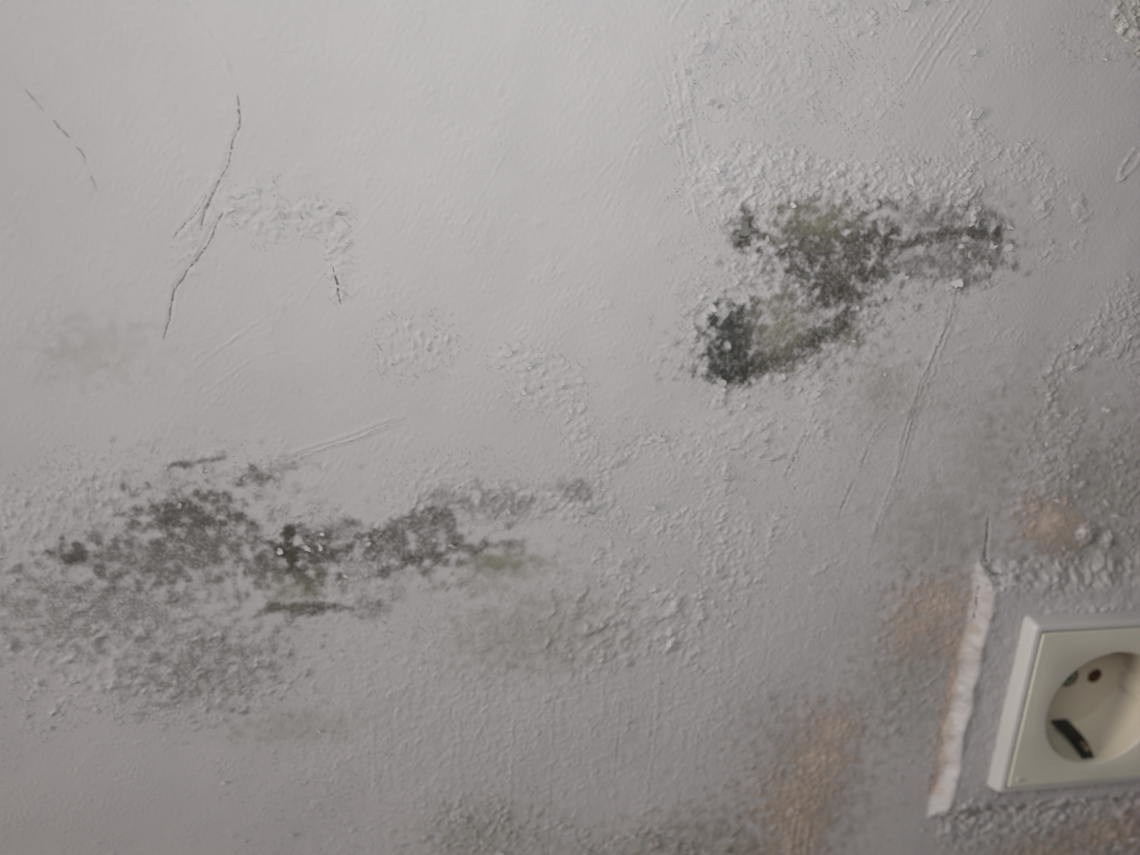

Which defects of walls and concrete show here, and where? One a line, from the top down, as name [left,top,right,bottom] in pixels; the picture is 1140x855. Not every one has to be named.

spalling [1112,0,1140,69]
crack [162,95,241,339]
peeling [166,168,357,309]
mould [707,208,883,383]
peeling [649,136,1030,405]
mould [131,491,254,546]
mould [268,526,351,615]
peeling [860,383,1140,855]
flaking render [759,709,851,855]